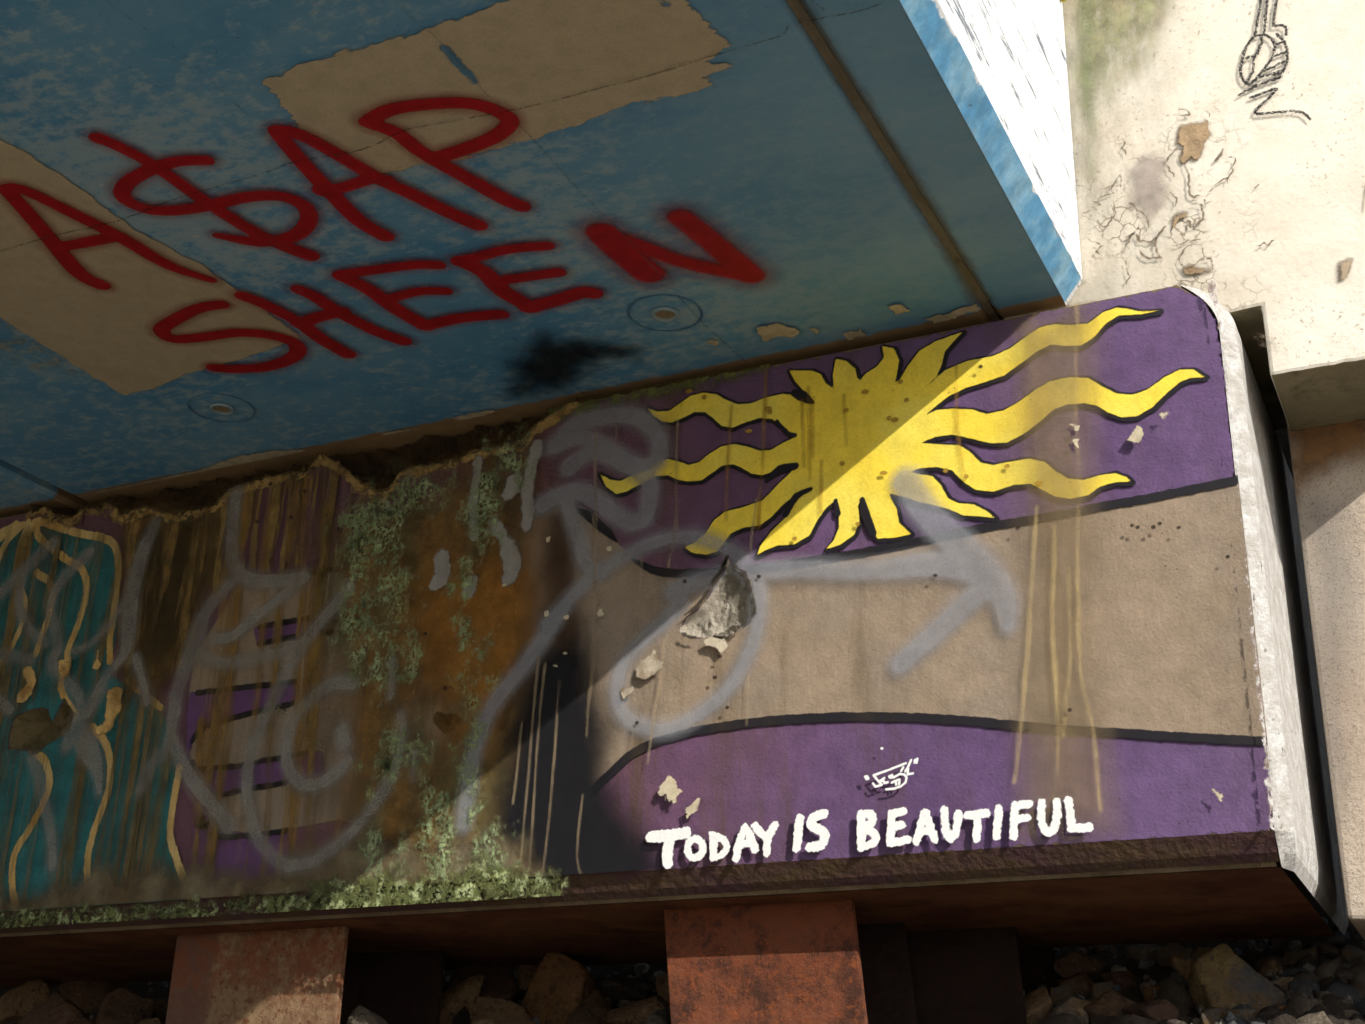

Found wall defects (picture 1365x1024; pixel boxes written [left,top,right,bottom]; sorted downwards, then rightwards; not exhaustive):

crack [1094,109,1259,284]
peeling [926,304,981,324]
spalling [25,397,580,527]
rust [192,465,530,853]
spalling [679,555,761,658]